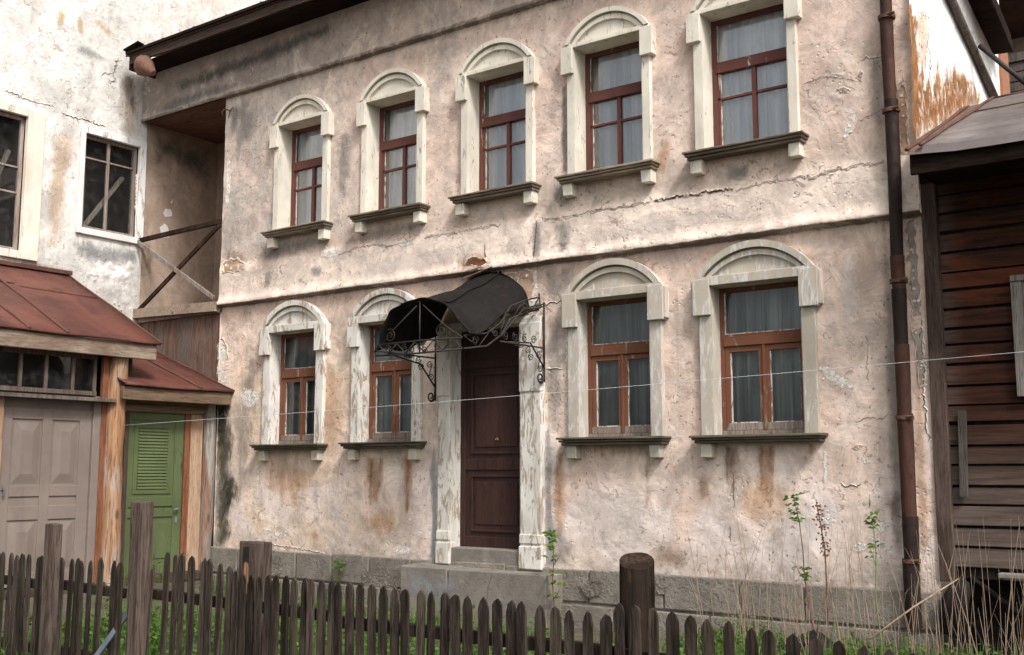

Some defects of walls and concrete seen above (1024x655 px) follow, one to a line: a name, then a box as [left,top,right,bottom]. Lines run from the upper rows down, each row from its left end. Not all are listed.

spalling [221,256,247,274]
spalling [463,255,538,308]
crack [335,159,885,282]
crack [919,318,931,442]